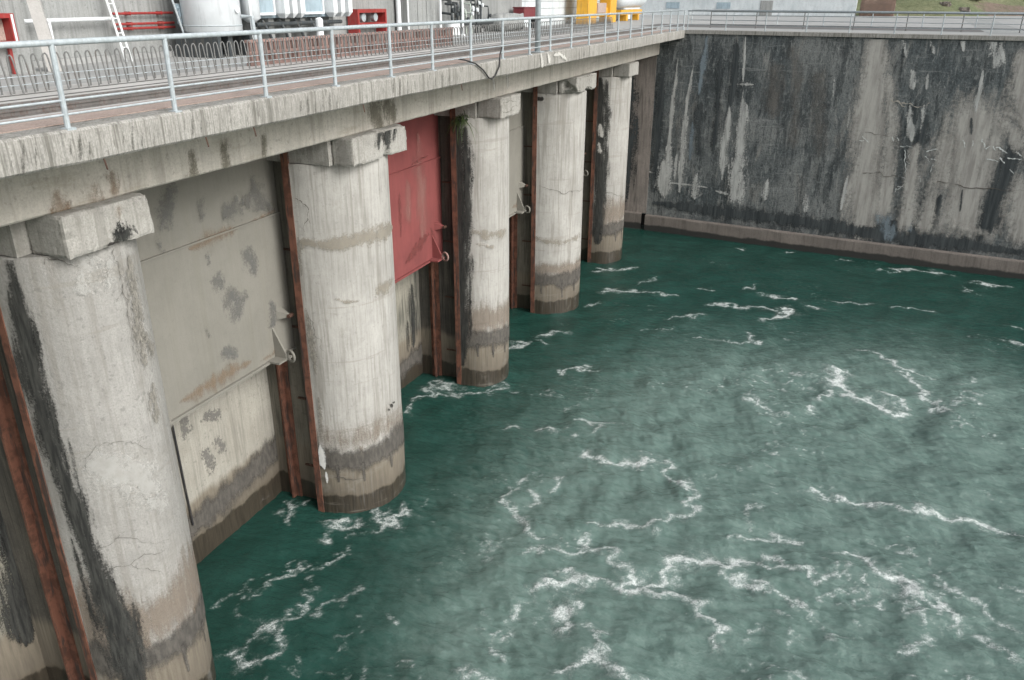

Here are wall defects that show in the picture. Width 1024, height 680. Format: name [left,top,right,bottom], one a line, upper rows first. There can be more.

leakage [113,221,138,242]
leakage [456,122,509,366]
leakage [592,36,1024,256]
leakage [0,511,35,647]
leakage [7,260,278,680]
leakage [317,412,405,482]